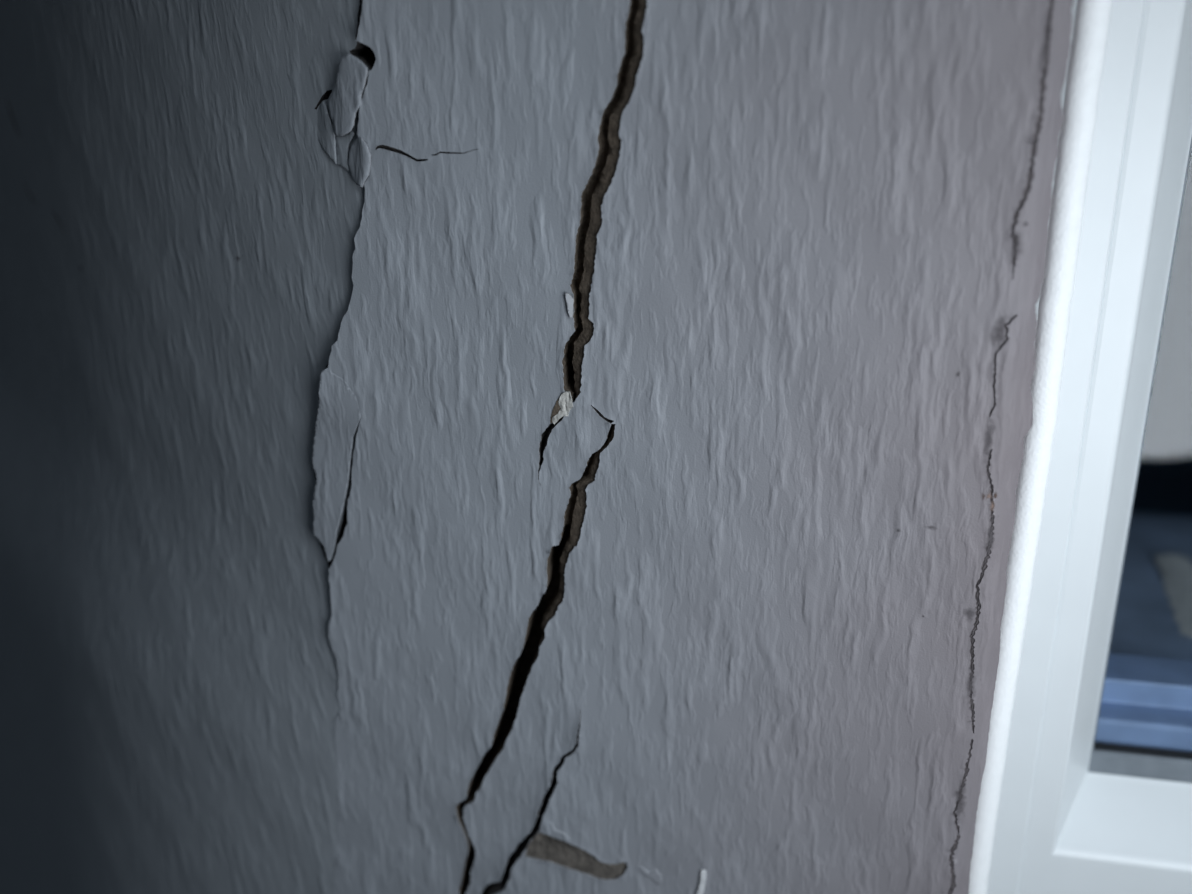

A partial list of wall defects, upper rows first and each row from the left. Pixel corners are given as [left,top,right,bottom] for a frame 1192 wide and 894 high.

peeling [314,54,372,187]
crack [375,145,478,162]
crack [1010,0,1055,279]
peeling [312,368,361,562]
crack [455,0,647,894]
crack [989,314,1017,418]
crack [947,449,995,894]
spalling [525,821,662,885]